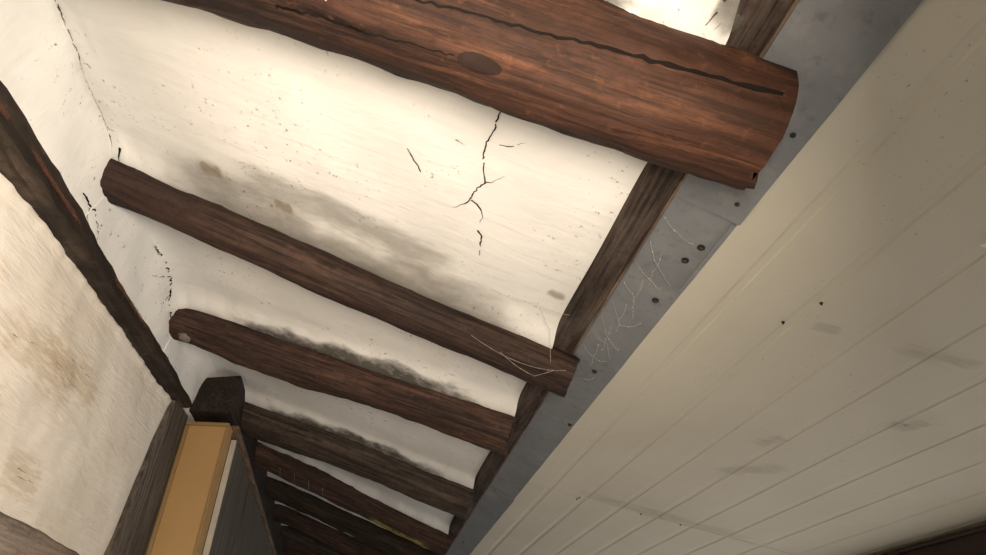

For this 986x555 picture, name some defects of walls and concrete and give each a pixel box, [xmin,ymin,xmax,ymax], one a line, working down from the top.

water stain [199,178,472,315]
crack [454,112,522,255]